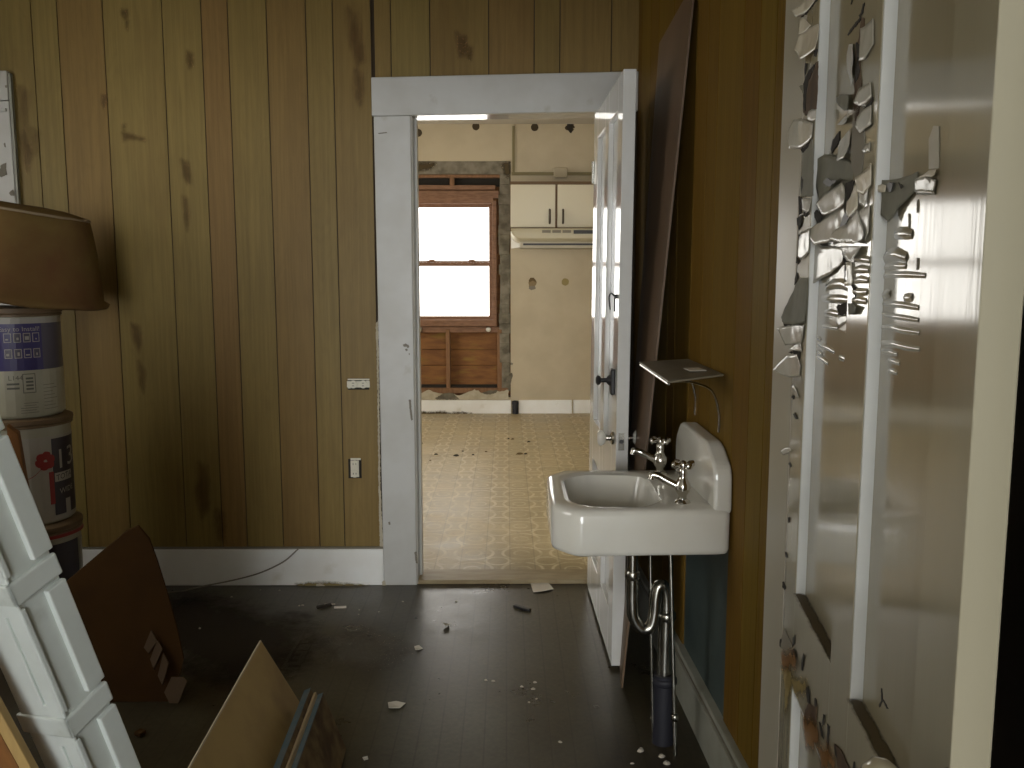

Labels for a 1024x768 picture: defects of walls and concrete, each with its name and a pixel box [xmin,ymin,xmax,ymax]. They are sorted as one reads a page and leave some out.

peeling [773,0,940,377]
flaking render [409,363,513,420]
peeling [803,686,855,768]